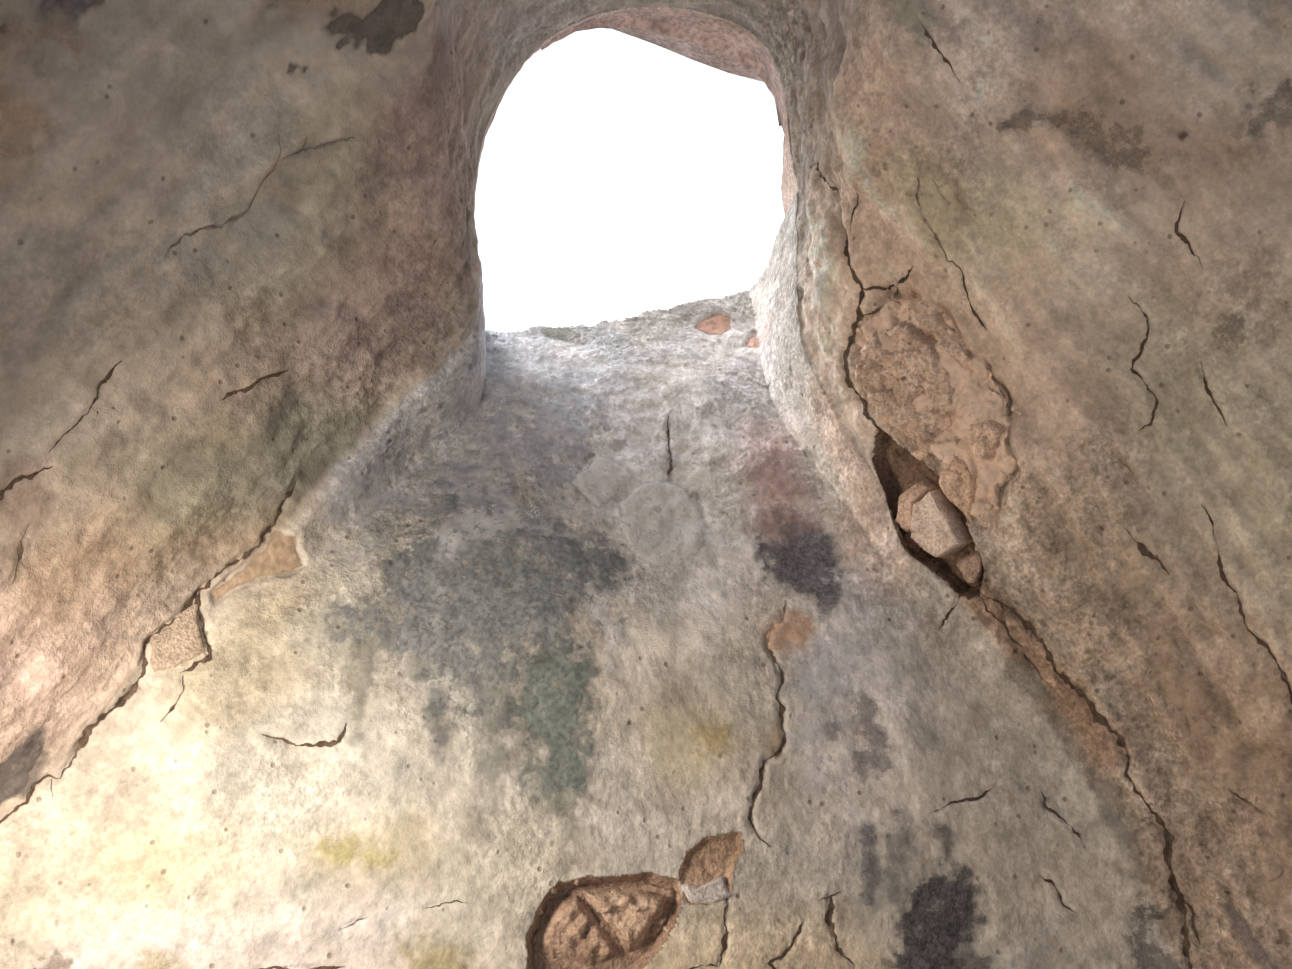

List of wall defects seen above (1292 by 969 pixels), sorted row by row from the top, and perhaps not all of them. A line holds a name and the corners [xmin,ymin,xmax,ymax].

damp [326,0,424,55]
damp [0,730,44,804]
crack [0,479,297,823]
spalling [213,533,302,602]
damp [324,353,631,802]
crack [748,605,786,847]
damp [753,450,843,614]
spalling [854,278,1021,598]
crack [921,548,1200,969]
crack [1201,505,1292,704]
spalling [525,831,744,969]
damp [858,809,990,969]